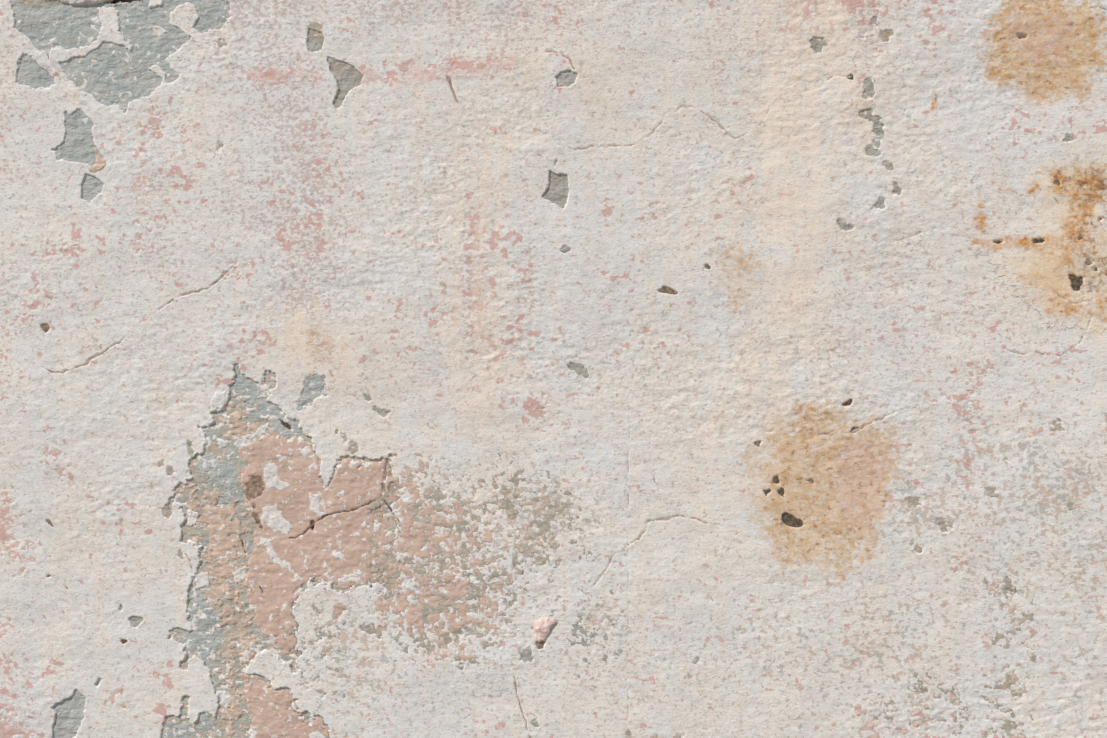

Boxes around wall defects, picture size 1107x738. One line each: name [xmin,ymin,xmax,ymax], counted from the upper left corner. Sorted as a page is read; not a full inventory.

peeling [11,0,230,138]
peeling [308,21,364,108]
peeling [52,109,106,203]
peeling [542,159,569,209]
corrosion [967,131,1107,356]
crack [159,266,233,310]
crack [43,338,125,374]
crack [289,458,401,539]
crack [594,403,717,586]
peeling [157,361,639,738]
peeling [0,690,86,738]